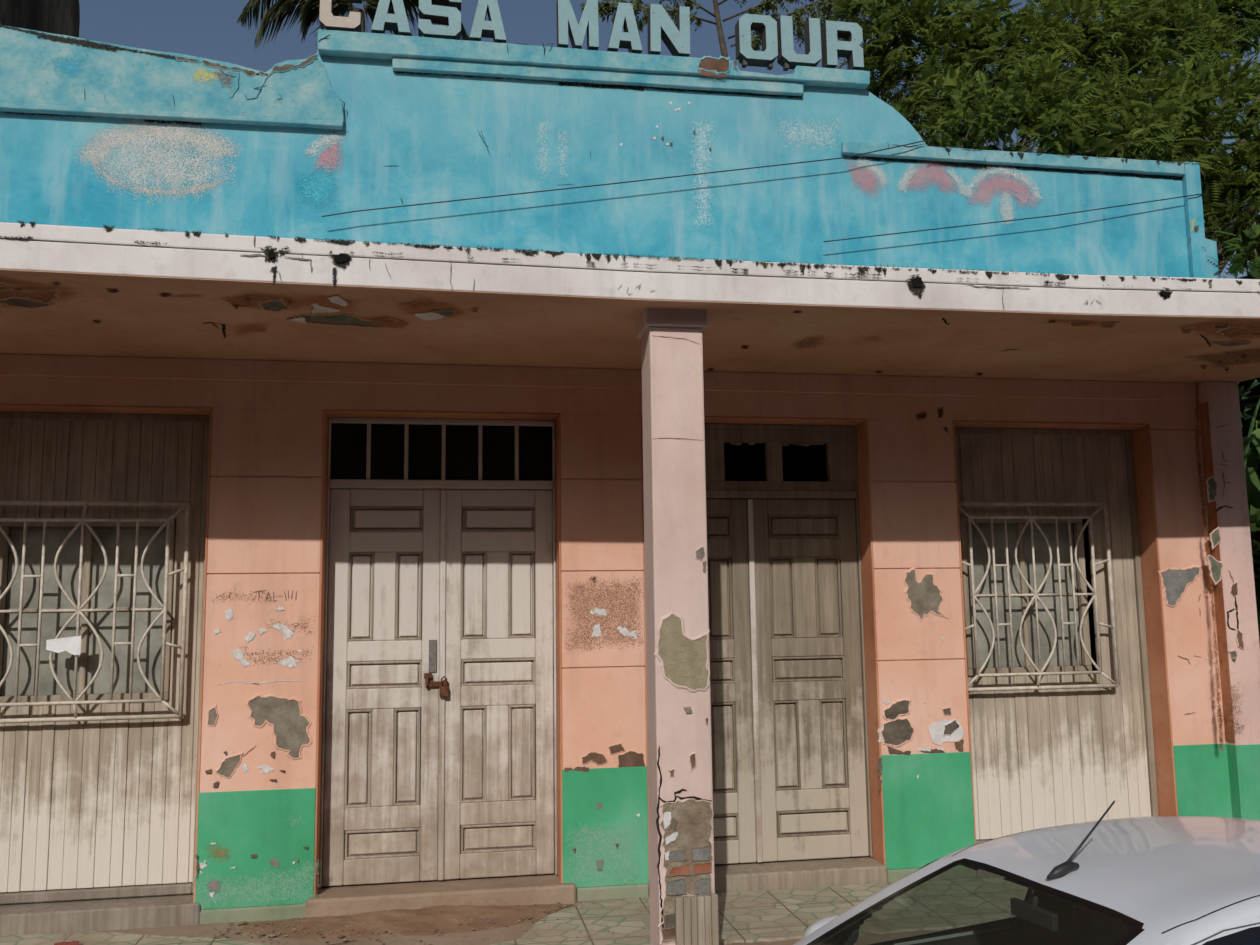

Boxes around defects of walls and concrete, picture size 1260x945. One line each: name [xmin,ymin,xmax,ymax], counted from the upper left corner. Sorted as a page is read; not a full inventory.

spalling [0,275,78,314]
spalling [1177,319,1260,347]
peeling [590,607,608,637]
peeling [617,626,639,639]
peeling [903,568,948,623]
peeling [1158,525,1244,662]
peeling [654,611,710,714]
peeling [205,693,313,788]
peeling [564,742,646,772]
peeling [689,752,697,773]
peeling [877,698,965,790]
spalling [658,798,714,945]